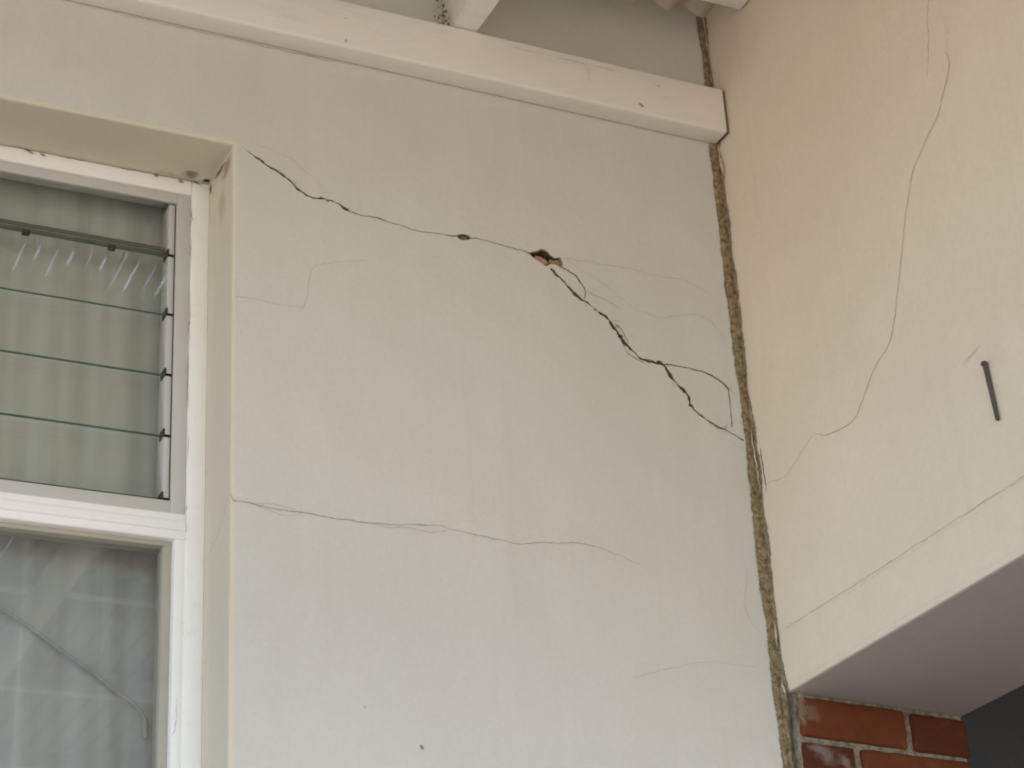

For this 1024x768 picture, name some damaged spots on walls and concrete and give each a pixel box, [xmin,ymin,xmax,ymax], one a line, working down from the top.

spalling [529,249,563,268]
crack [240,145,744,441]
crack [221,496,631,561]